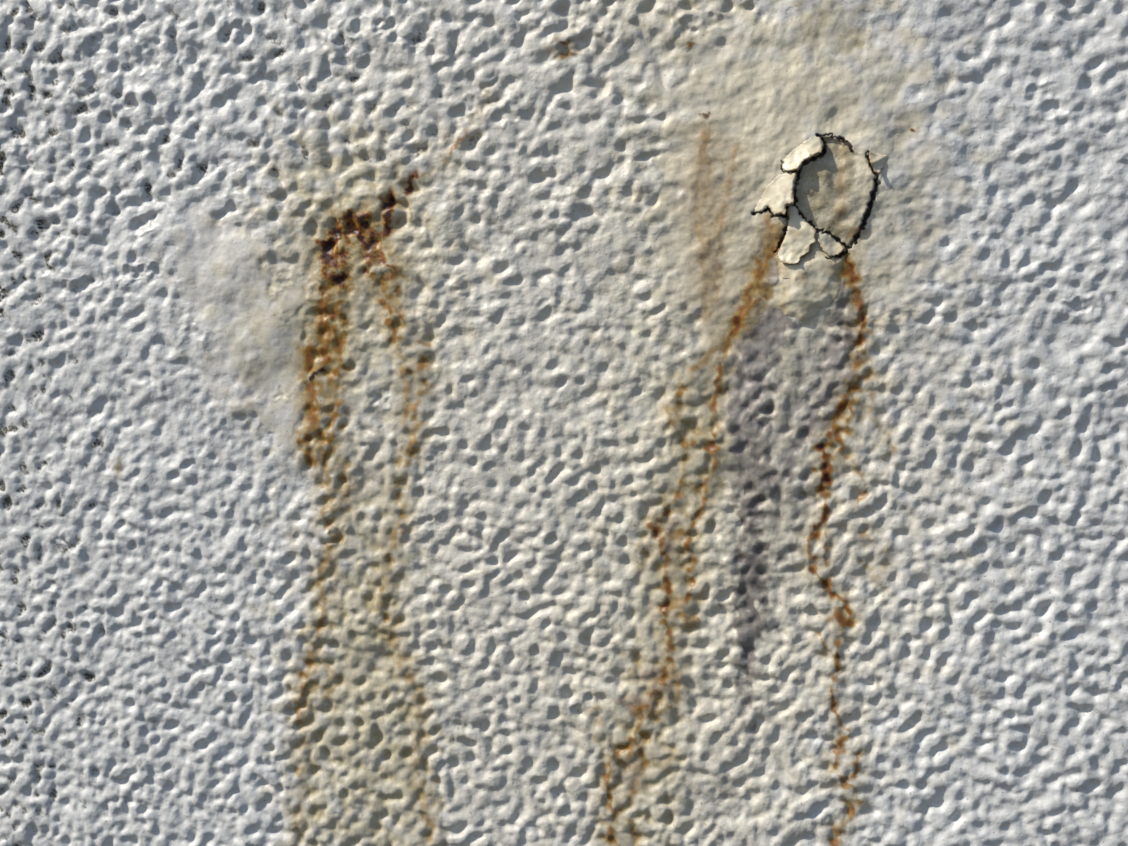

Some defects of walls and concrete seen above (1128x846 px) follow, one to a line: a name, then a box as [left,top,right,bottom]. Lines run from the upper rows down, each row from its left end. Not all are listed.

rust [695,111,727,290]
peeling [752,134,887,321]
rust [296,170,418,601]
rust [397,340,432,465]
rust [603,234,785,845]
rust [807,252,870,846]
rust [295,652,324,742]